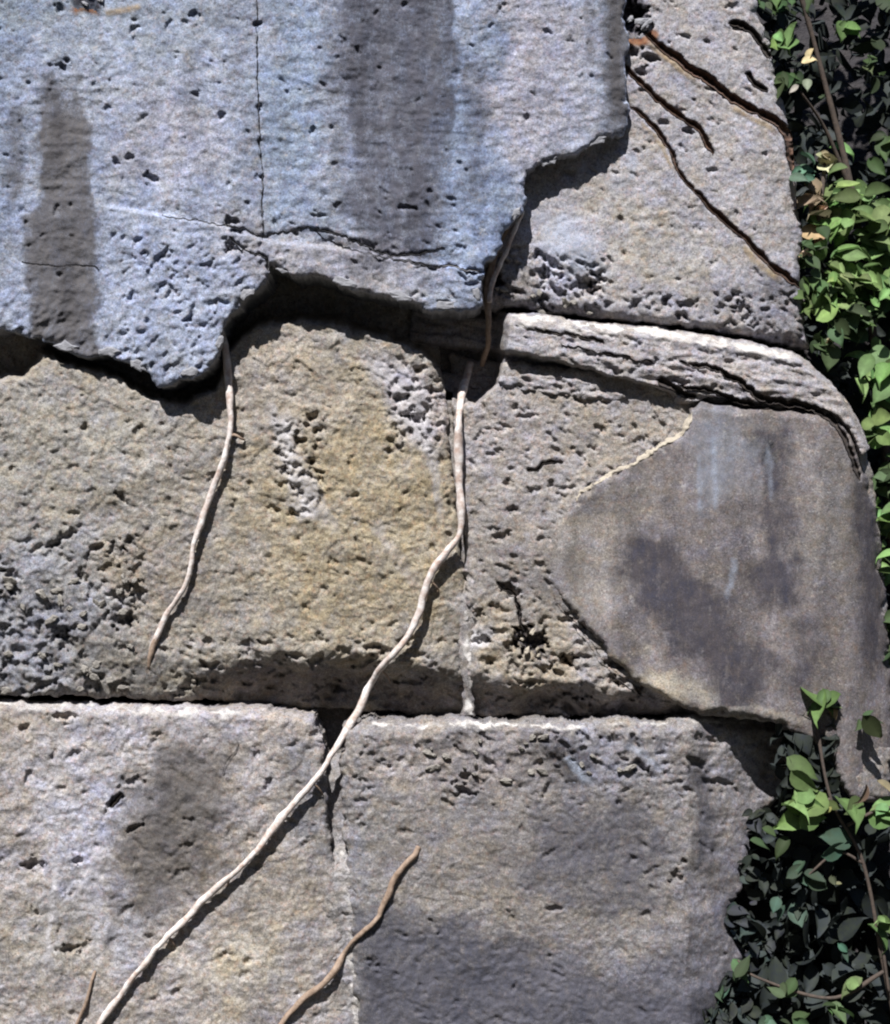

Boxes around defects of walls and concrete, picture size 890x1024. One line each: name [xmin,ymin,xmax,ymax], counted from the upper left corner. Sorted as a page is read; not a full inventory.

damp [23,77,101,357]
crack [162,0,481,271]
damp [331,0,457,272]
crack [625,66,800,288]
crack [645,20,794,171]
crack [516,324,861,480]
damp [622,539,778,706]
damp [750,429,800,605]